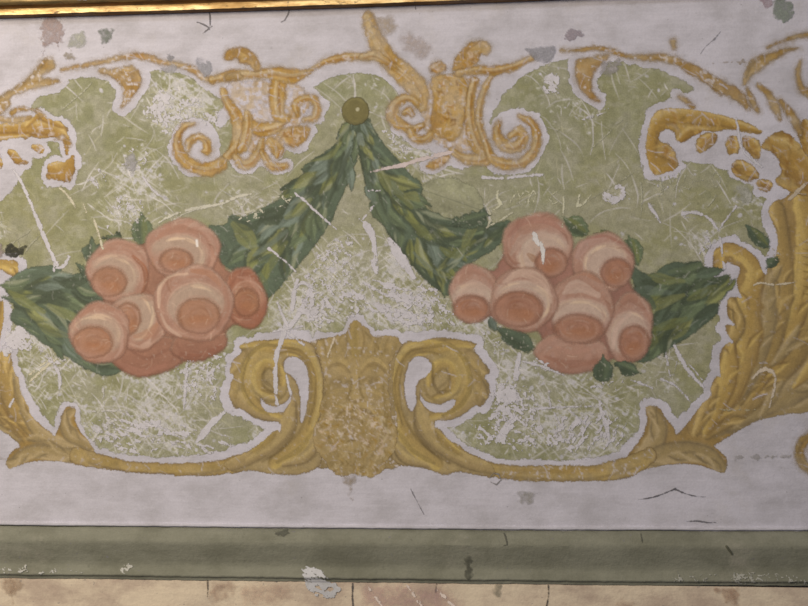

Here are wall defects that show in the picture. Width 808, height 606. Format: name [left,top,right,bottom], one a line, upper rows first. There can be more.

peeling [297,237,455,329]
peeling [2,326,72,369]
peeling [174,354,226,403]
peeling [83,410,233,455]
peeling [471,377,626,454]
crack [644,488,695,499]
peeling [301,566,341,598]